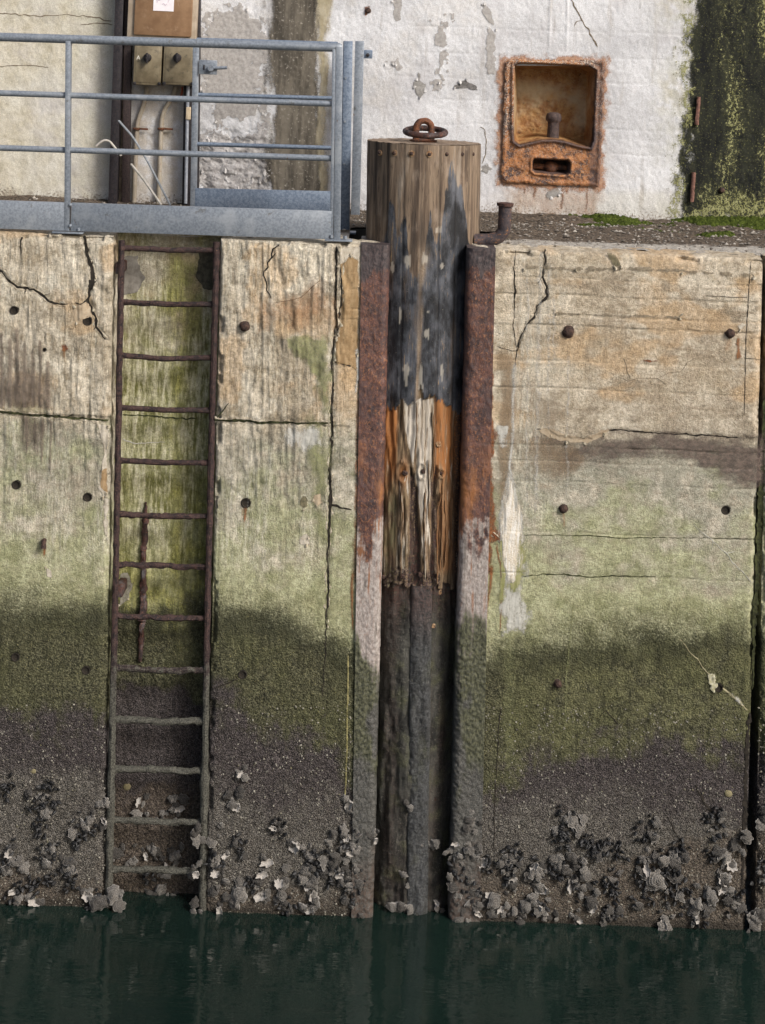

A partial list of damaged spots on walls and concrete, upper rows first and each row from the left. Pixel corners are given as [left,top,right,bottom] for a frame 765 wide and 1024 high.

water stain [263,0,333,191]
peeling [391,0,402,21]
peeling [413,13,478,98]
peeling [482,2,497,74]
corrosion [494,55,611,207]
water stain [665,0,765,218]
crack [500,249,551,386]
crack [0,235,353,697]
corrosion [487,374,502,629]
water stain [499,354,540,633]
crack [522,264,765,890]
water stain [531,432,765,489]